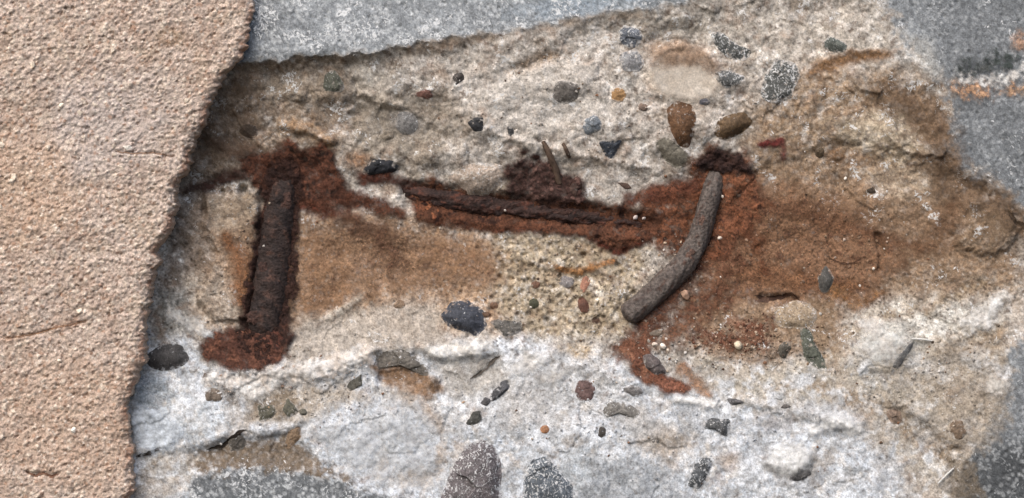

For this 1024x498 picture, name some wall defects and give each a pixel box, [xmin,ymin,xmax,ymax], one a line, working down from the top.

corrosion [808,50,888,76]
corrosion [184,137,922,396]
spalling [685,258,722,306]